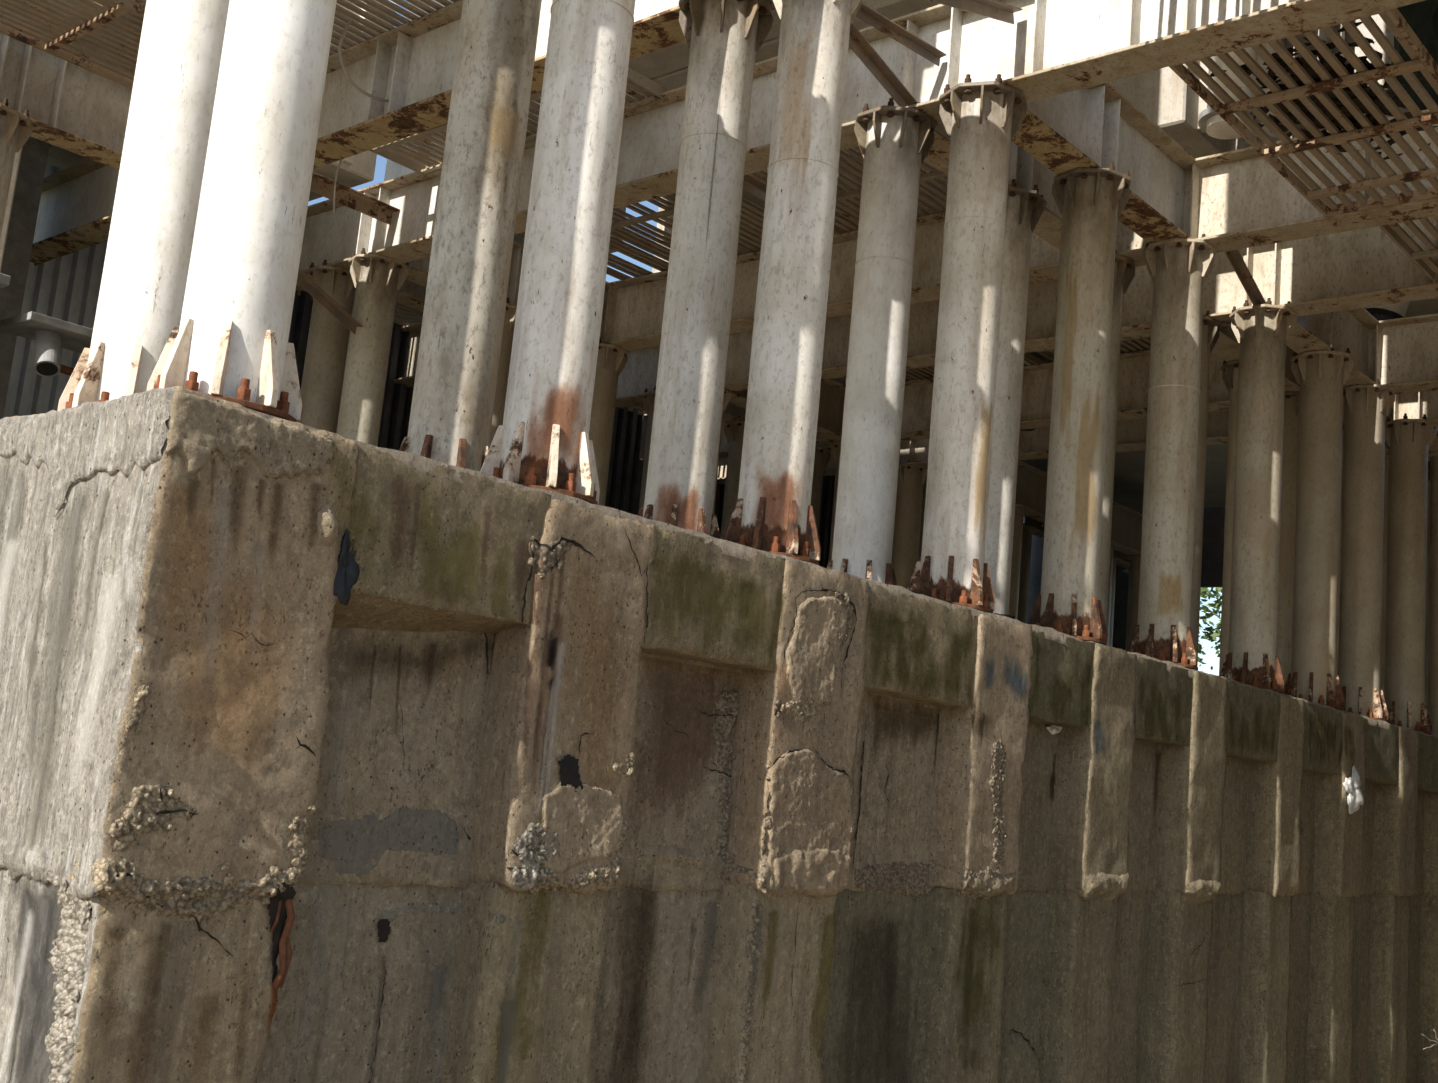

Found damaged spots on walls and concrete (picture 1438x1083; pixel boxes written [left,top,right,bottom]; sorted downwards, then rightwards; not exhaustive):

crack [483,633,491,679]
crack [521,537,595,623]
crack [621,523,649,643]
crack [782,589,857,684]
peeling [502,752,636,895]
crack [766,720,890,875]
spalling [45,784,319,1083]